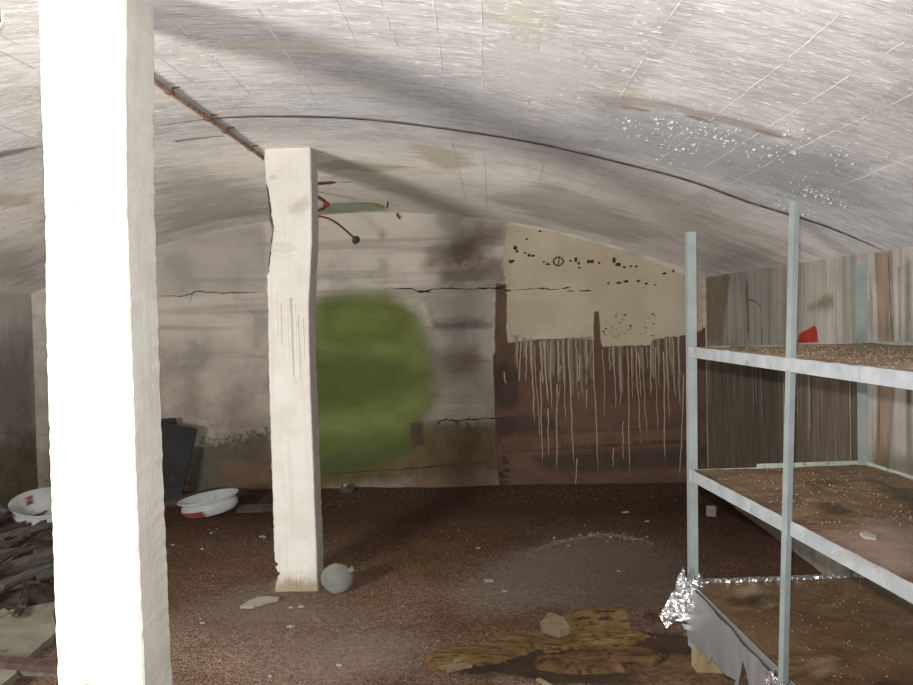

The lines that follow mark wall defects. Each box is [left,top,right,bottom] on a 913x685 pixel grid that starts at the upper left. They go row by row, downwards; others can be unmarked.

crack [171,291,266,303]
crack [386,285,591,293]
damp [320,277,858,485]
damp [0,435,38,509]